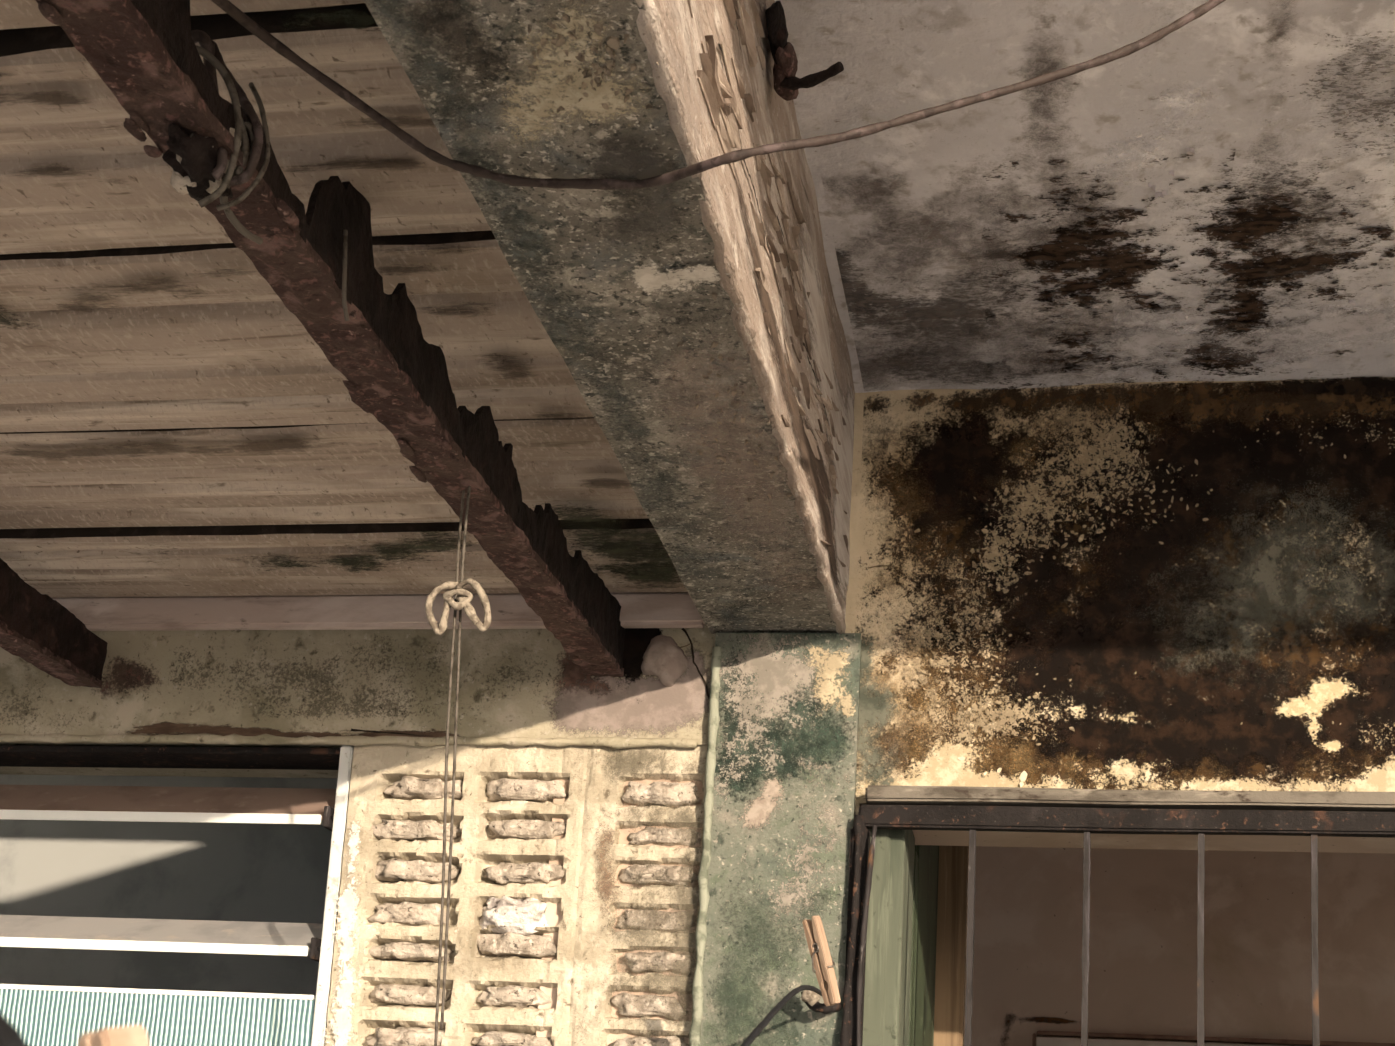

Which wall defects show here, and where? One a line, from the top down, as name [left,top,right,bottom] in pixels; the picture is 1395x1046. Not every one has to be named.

rust [38,2,62,26]
rust [124,110,233,201]
rust [276,197,299,231]
rust [343,380,441,486]
leakage [800,31,1395,791]
rust [93,657,159,699]
rust [557,653,611,696]
leakage [714,634,854,810]